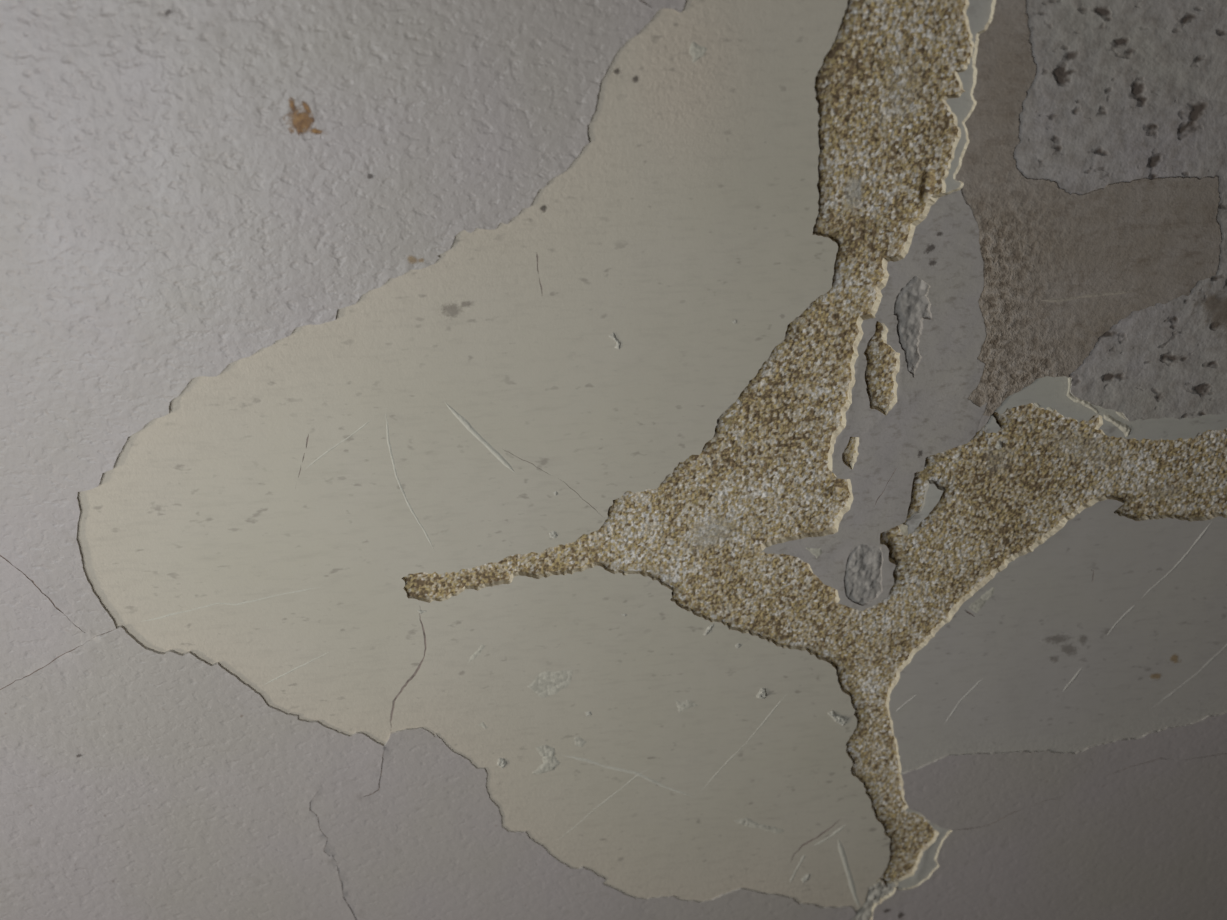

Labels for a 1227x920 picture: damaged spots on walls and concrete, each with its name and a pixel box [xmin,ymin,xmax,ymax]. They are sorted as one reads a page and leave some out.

rust [289,98,322,135]
crack [310,795,356,920]
peeling [76,0,891,912]
spalling [401,0,1227,920]